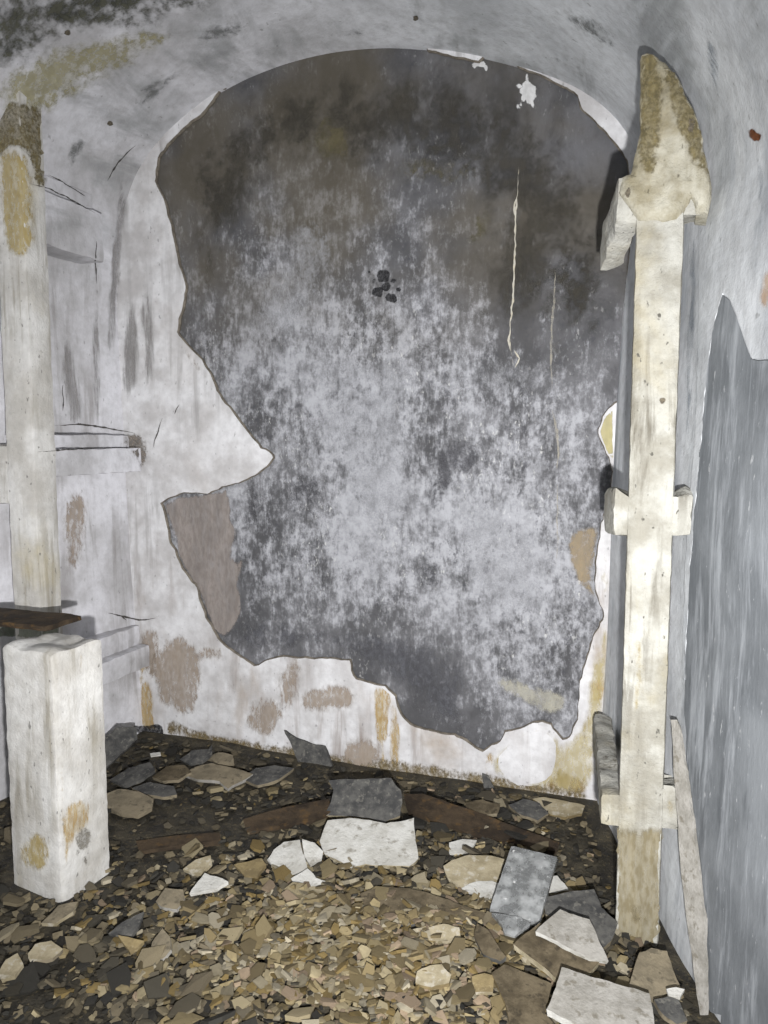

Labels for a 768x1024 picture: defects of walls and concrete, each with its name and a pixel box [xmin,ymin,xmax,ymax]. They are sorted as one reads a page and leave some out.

water stain [9,33,164,108]
water stain [0,0,193,60]
crack [33,176,95,213]
water stain [328,88,584,307]
crack [508,172,520,367]
water stain [124,298,152,390]
flaking render [155,48,630,752]
water stain [134,724,163,734]
water stain [142,631,220,713]
water stain [247,664,352,735]
water stain [345,741,379,766]
flaking render [684,295,768,1024]